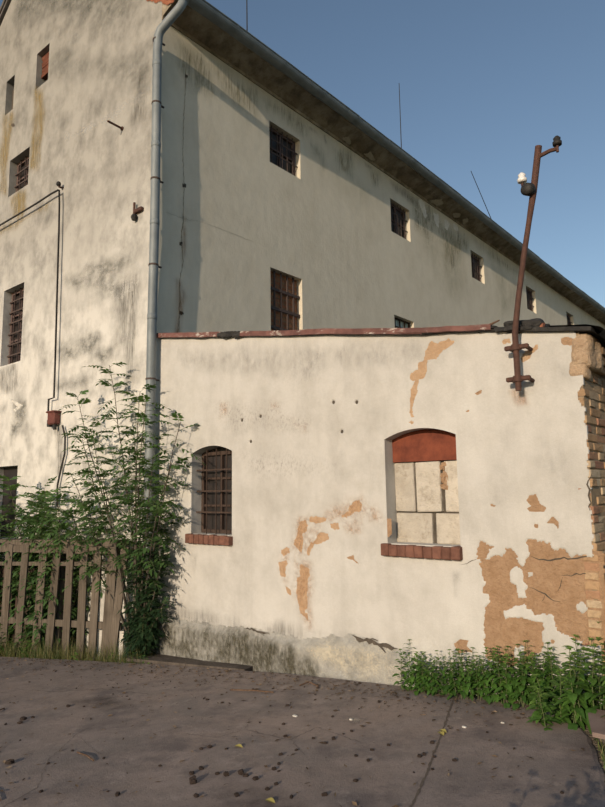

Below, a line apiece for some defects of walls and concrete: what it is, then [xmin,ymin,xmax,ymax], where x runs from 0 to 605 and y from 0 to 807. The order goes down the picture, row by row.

crack [166,67,251,323]
peeling [409,338,454,424]
spalling [527,494,559,529]
water stain [156,623,275,673]
peeling [278,500,362,621]
spalling [454,639,472,653]
spalling [476,539,605,667]